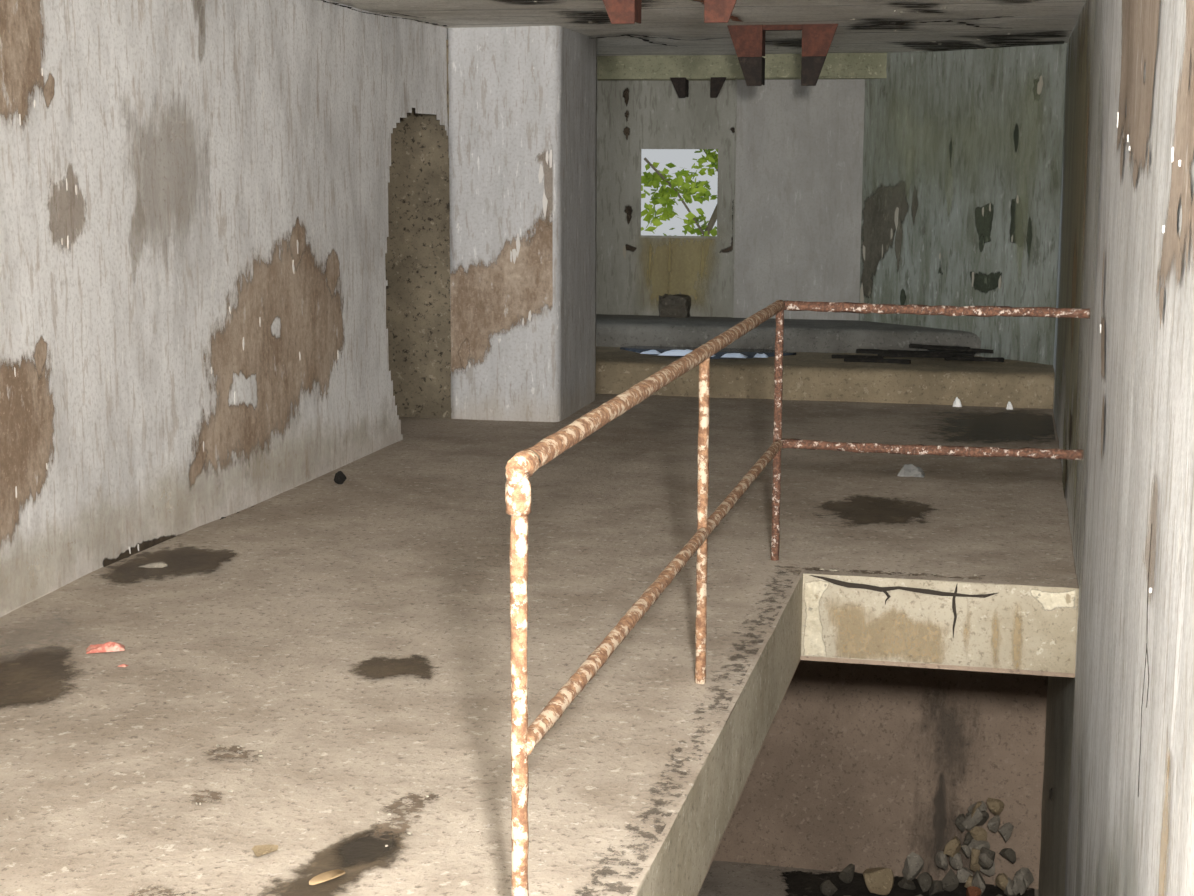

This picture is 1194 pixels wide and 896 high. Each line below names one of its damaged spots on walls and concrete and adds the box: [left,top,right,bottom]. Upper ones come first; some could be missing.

peeling [0,0,55,128]
peeling [1117,0,1161,191]
peeling [450,150,553,373]
peeling [189,217,345,489]
peeling [0,337,55,548]
damp [100,546,236,583]
damp [0,645,78,708]
damp [349,655,438,679]
corrosion [832,607,941,664]
crack [810,575,998,638]
corrosion [1013,615,1022,669]
damp [260,826,406,896]